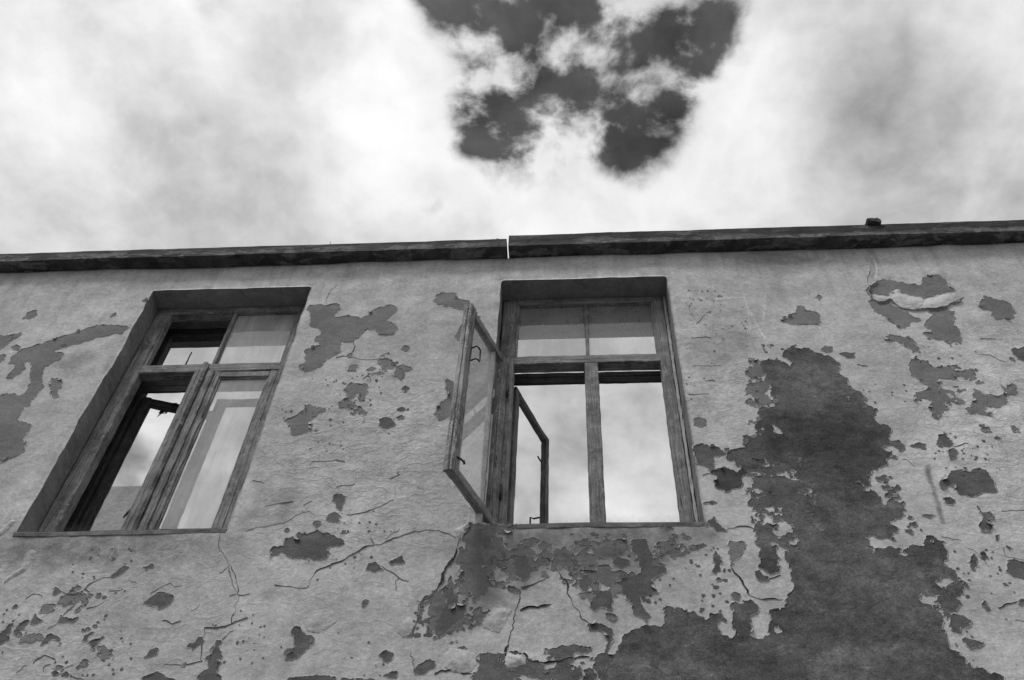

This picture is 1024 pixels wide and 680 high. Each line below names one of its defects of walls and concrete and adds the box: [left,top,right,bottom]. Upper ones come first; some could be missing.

peeling [0,312,130,461]
peeling [281,303,413,449]
peeling [0,563,160,677]
crack [162,531,250,665]
peeling [269,493,406,573]
crack [274,471,614,675]
spalling [405,274,1024,680]